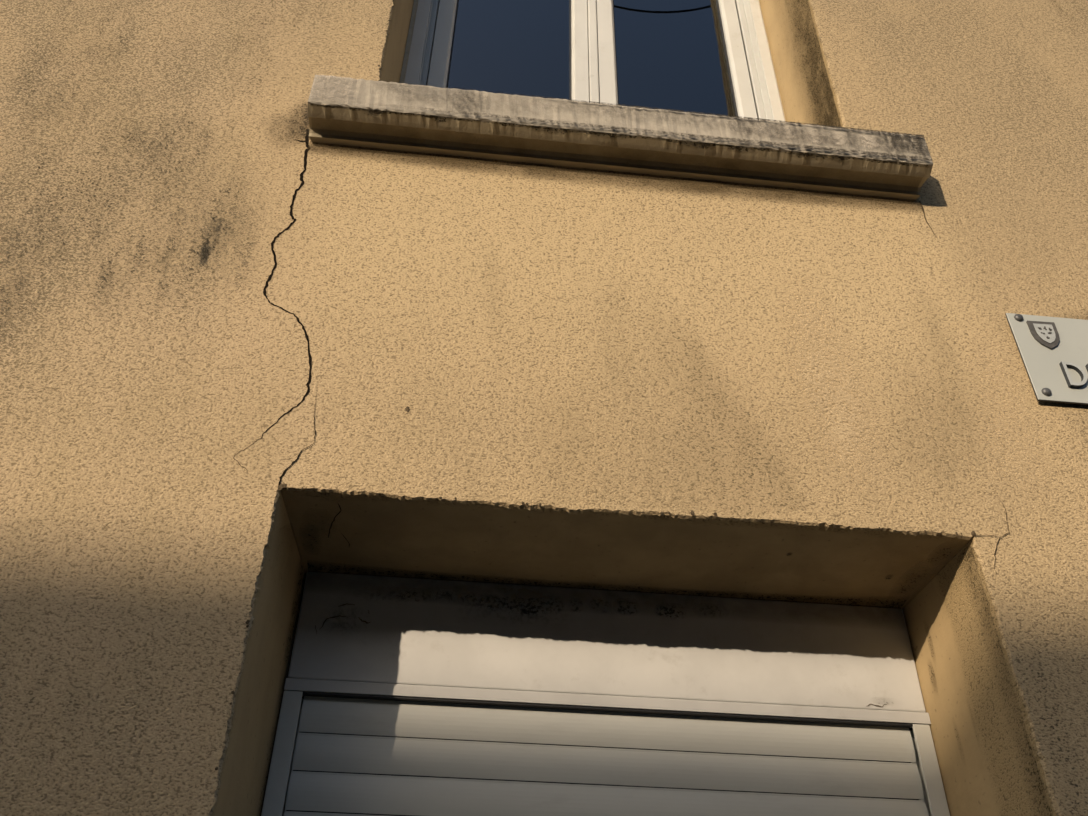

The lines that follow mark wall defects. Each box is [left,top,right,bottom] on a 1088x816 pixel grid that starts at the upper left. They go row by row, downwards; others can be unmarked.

crack [233,129,316,485]
leakage [279,563,926,704]